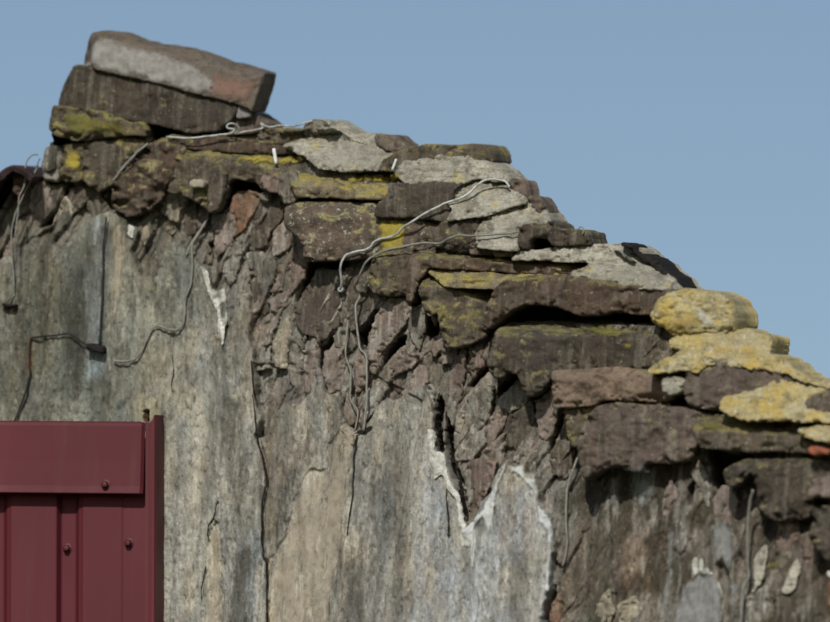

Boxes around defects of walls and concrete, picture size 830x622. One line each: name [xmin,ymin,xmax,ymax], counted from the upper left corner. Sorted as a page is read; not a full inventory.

spalling [127,224,150,245]
spalling [200,266,228,345]
crack [251,361,269,622]
flaking render [340,425,355,444]
crack [347,426,372,535]
crack [435,393,468,537]
spalling [427,429,553,590]
flaking render [676,557,723,622]
flaking render [752,545,768,591]
flaking render [782,559,801,593]